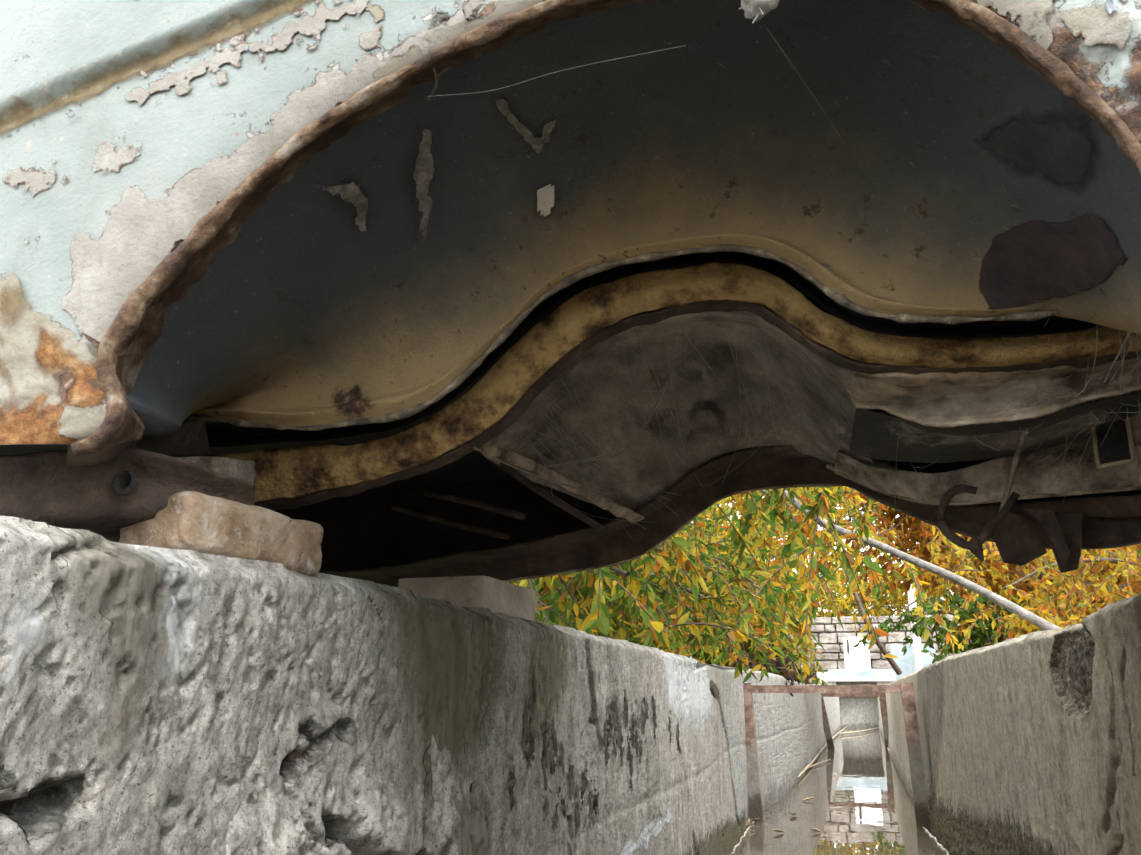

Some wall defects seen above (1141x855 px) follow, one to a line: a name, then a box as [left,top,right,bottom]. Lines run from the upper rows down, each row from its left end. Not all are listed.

spalling [279,717,357,785]
leakage [527,621,566,728]
leakage [666,655,711,721]
flaking render [1049,615,1119,833]
spalling [0,765,85,845]